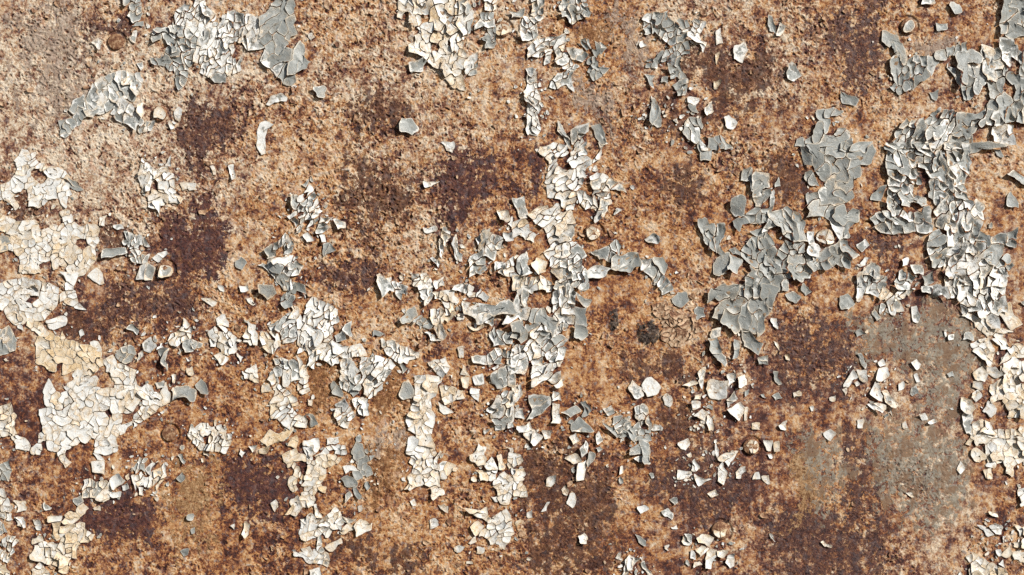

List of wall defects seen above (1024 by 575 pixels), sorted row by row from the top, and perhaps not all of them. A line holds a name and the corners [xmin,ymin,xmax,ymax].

peeling [58,0,315,138]
peeling [397,0,497,91]
peeling [509,0,609,136]
peeling [639,11,748,161]
corrosion [656,21,794,142]
corrosion [58,90,248,349]
corrosion [70,439,300,566]
peeling [0,121,689,575]
corrosion [320,366,427,575]
corrosion [314,81,551,302]
corrosion [494,301,752,575]
peeling [677,0,1024,540]